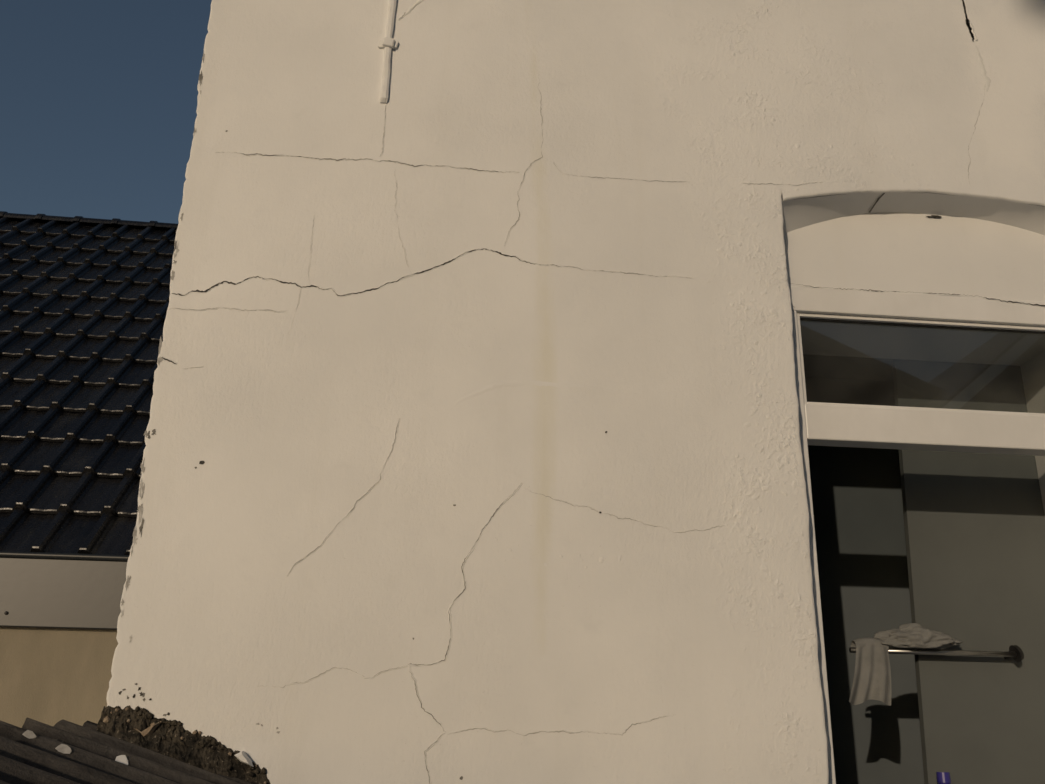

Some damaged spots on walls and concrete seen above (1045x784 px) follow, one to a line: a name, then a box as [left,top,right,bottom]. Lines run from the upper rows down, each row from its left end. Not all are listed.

crack [962,0,978,42]
crack [169,74,692,335]
crack [790,283,1045,308]
crack [286,418,401,577]
crack [258,482,725,784]
spalling [96,683,270,784]